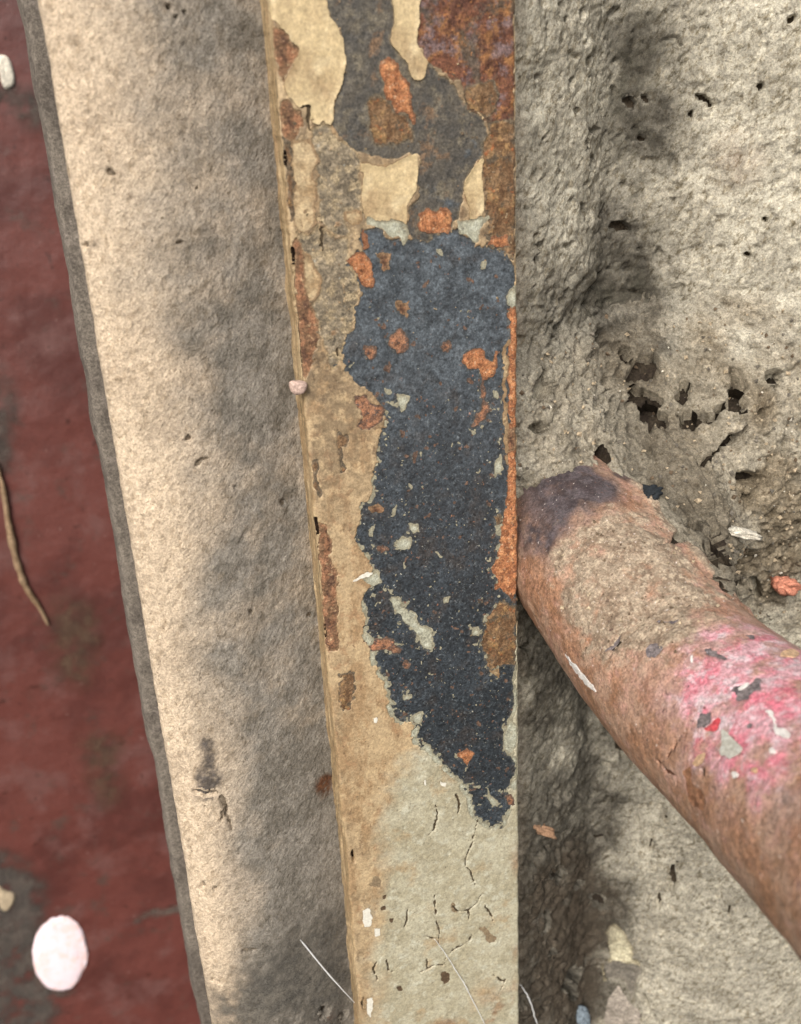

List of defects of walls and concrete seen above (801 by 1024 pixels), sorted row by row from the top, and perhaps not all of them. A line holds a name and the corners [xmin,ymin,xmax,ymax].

corrosion [272,28,299,82]
corrosion [417,0,516,270]
peeling [268,0,527,830]
corrosion [461,306,518,674]
spalling [642,484,663,500]
corrosion [318,522,340,651]
crack [404,793,493,972]